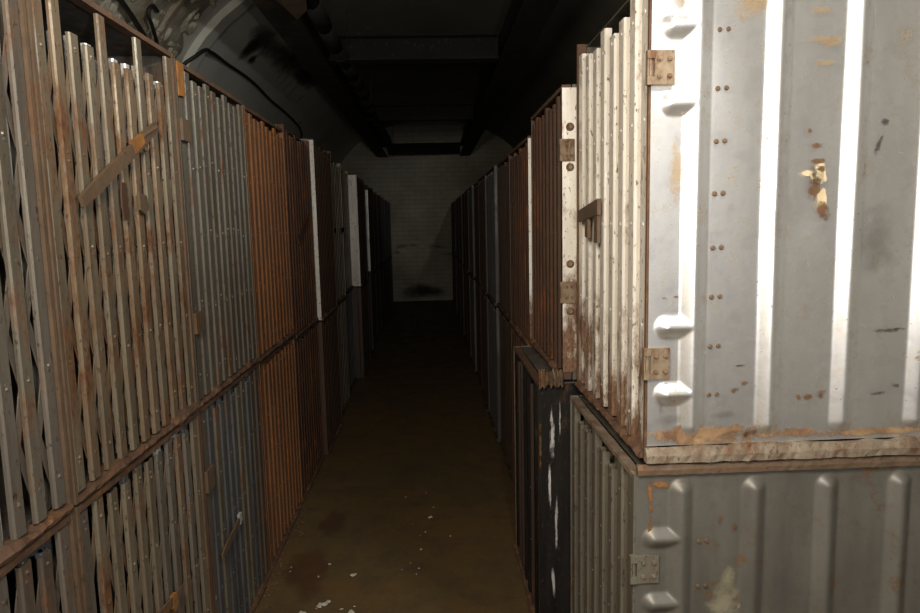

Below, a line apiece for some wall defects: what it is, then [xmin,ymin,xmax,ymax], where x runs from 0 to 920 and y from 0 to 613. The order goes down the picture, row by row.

peeling [92,0,217,59]